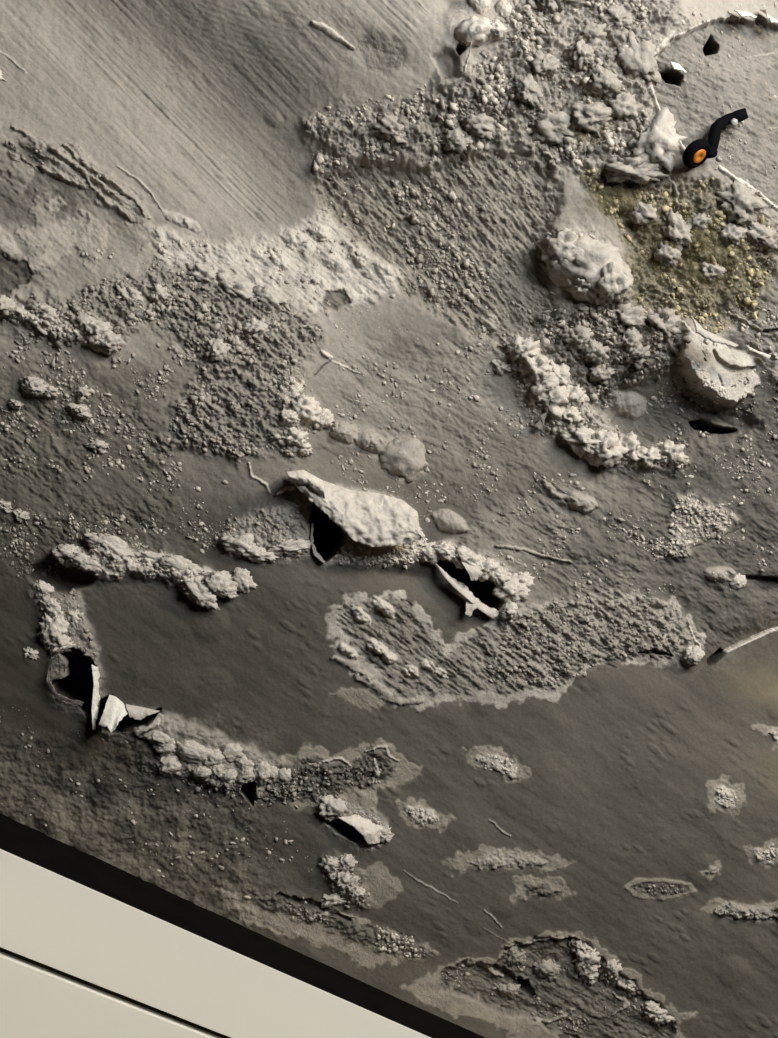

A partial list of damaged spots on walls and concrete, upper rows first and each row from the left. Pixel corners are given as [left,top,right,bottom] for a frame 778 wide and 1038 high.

peeling [3,126,165,224]
spalling [302,0,778,472]
spalling [0,262,778,816]
crack [744,574,778,582]
peeling [395,797,456,833]
spalling [216,844,698,1038]
peeling [699,861,721,882]
spalling [701,899,778,927]